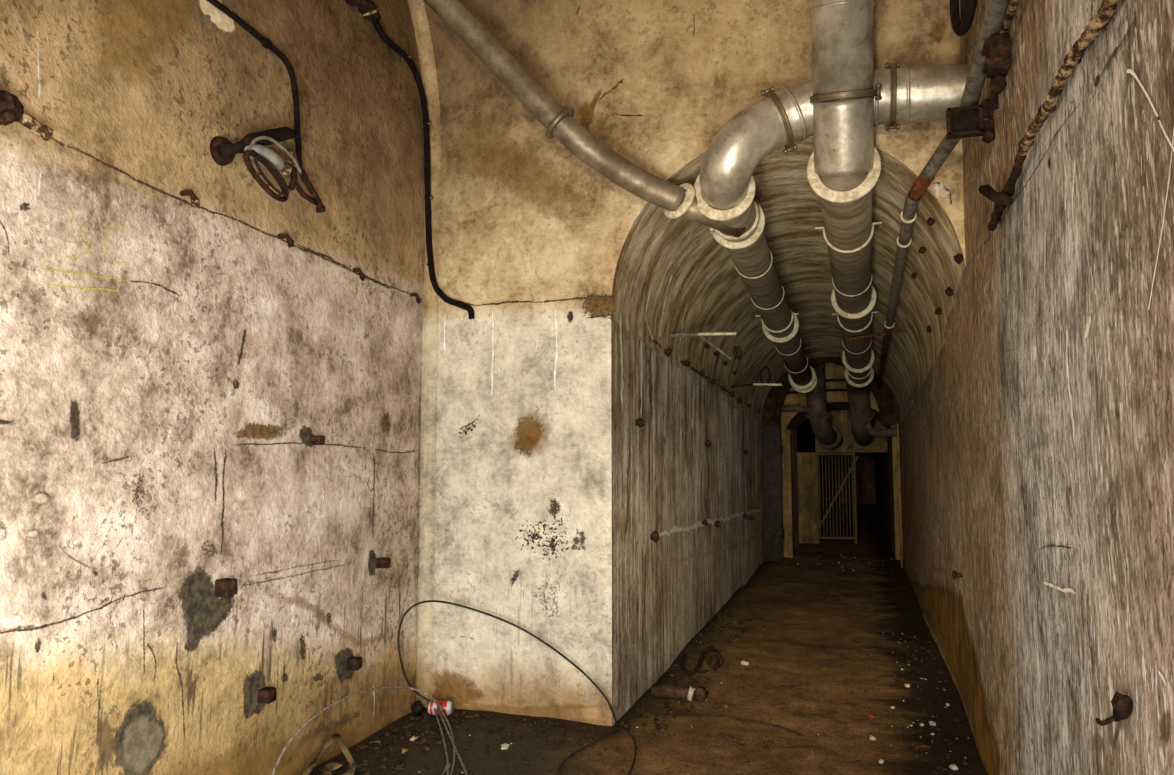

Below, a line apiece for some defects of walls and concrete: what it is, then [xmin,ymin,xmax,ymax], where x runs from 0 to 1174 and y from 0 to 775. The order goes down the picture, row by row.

crack [51,137,411,296]
corrosion [514,417,543,456]
leakage [512,500,585,561]
leakage [178,541,235,652]
crack [0,587,185,739]
leakage [243,671,266,718]
leakage [334,648,354,681]
leakage [98,700,167,775]